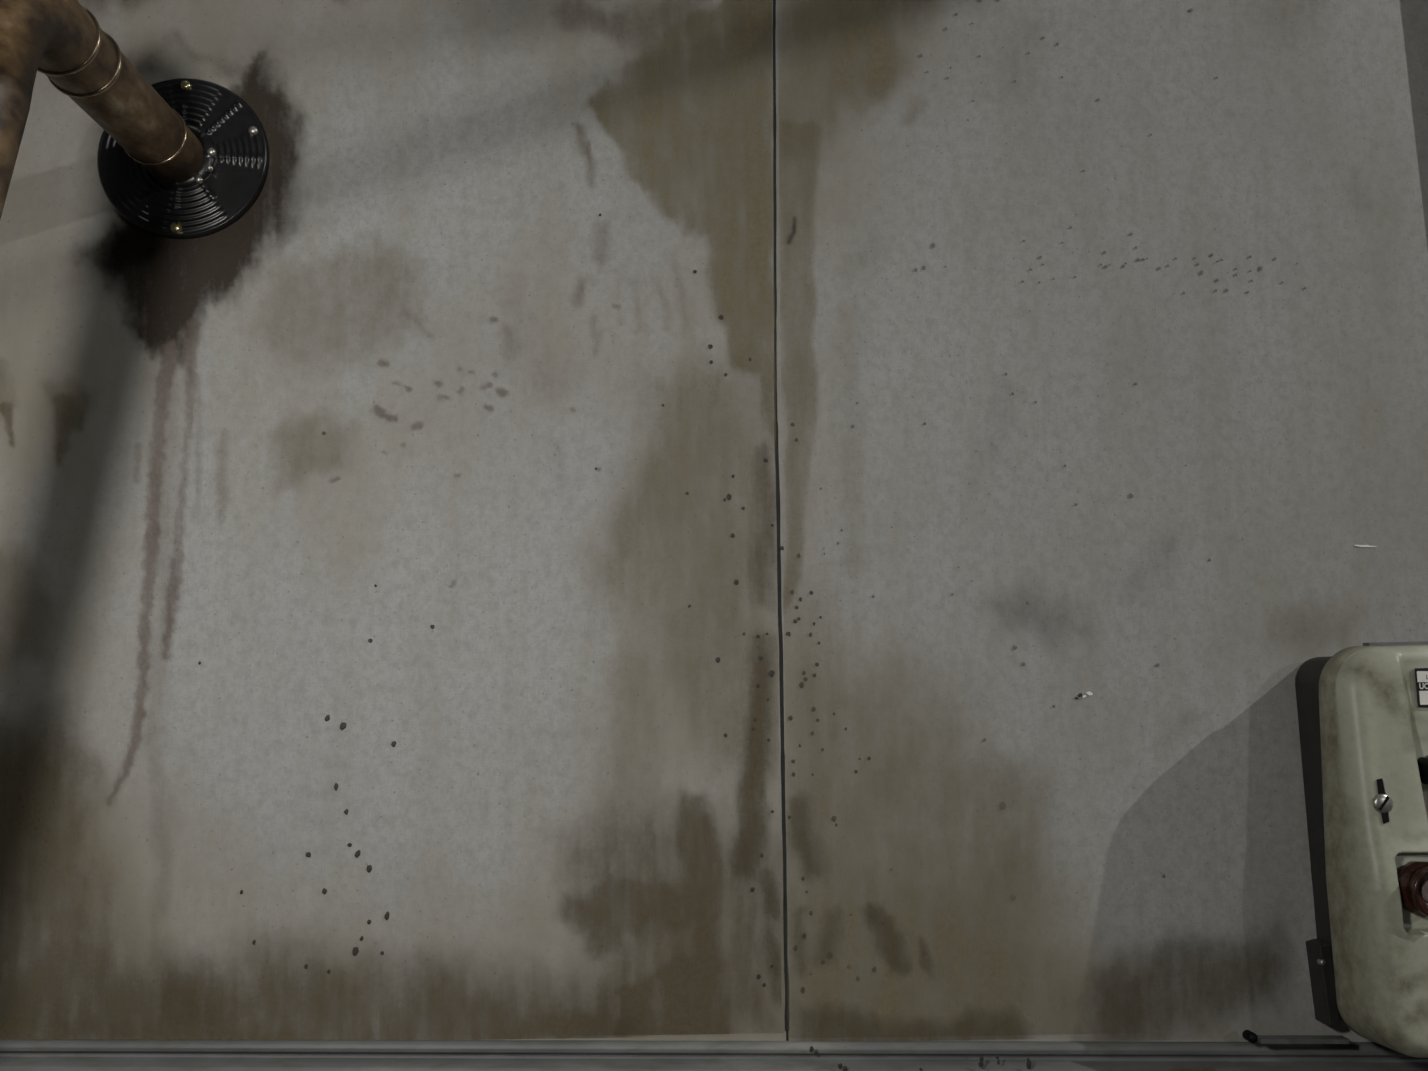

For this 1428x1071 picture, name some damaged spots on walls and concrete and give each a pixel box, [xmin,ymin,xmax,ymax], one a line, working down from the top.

damp [95,58,298,385]
damp [590,0,795,395]
damp [147,459,159,590]
damp [118,703,145,786]
damp [0,731,758,1040]